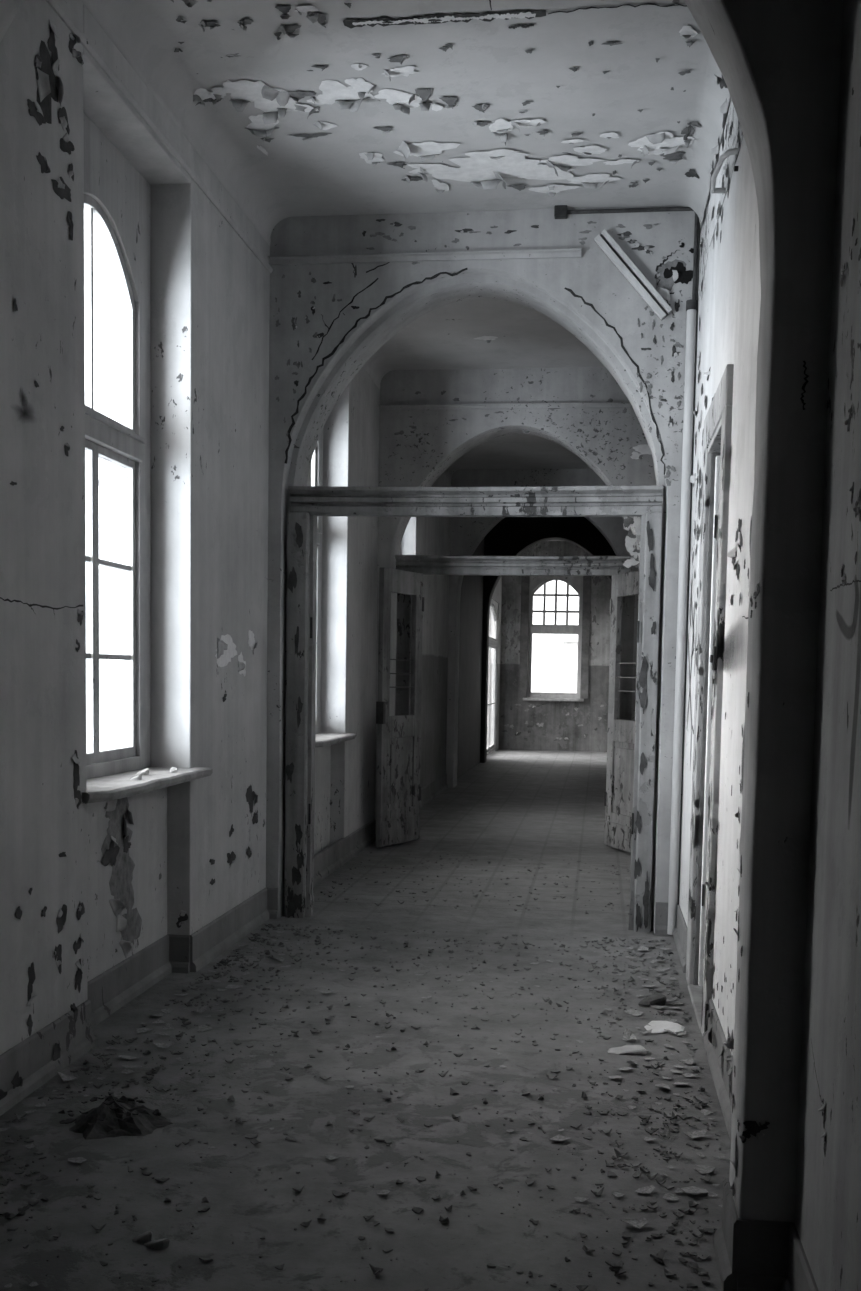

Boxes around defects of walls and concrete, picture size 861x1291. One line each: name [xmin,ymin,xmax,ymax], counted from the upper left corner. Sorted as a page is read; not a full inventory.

flaking render [274,3,546,40]
crack [548,3,687,14]
peeling [679,26,698,47]
flaking render [193,54,760,719]
peeling [849,481,861,522]
crack [0,597,83,615]
flaking render [101,797,142,958]
peeling [271,824,303,941]
peeling [27,962,38,1036]
peeling [41,902,85,1023]
peeling [604,746,770,1207]
peeling [621,1217,648,1229]